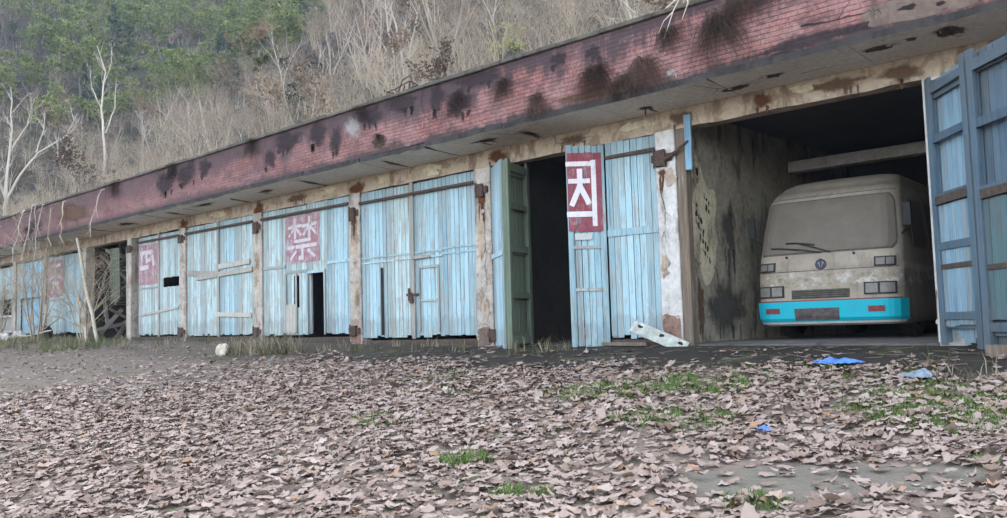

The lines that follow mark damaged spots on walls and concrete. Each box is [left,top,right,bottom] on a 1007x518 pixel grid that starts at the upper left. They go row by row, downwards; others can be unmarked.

spalling [861,0,978,27]
spalling [935,26,964,37]
leakage [430,70,497,121]
leakage [264,95,415,172]
leakage [157,158,211,198]